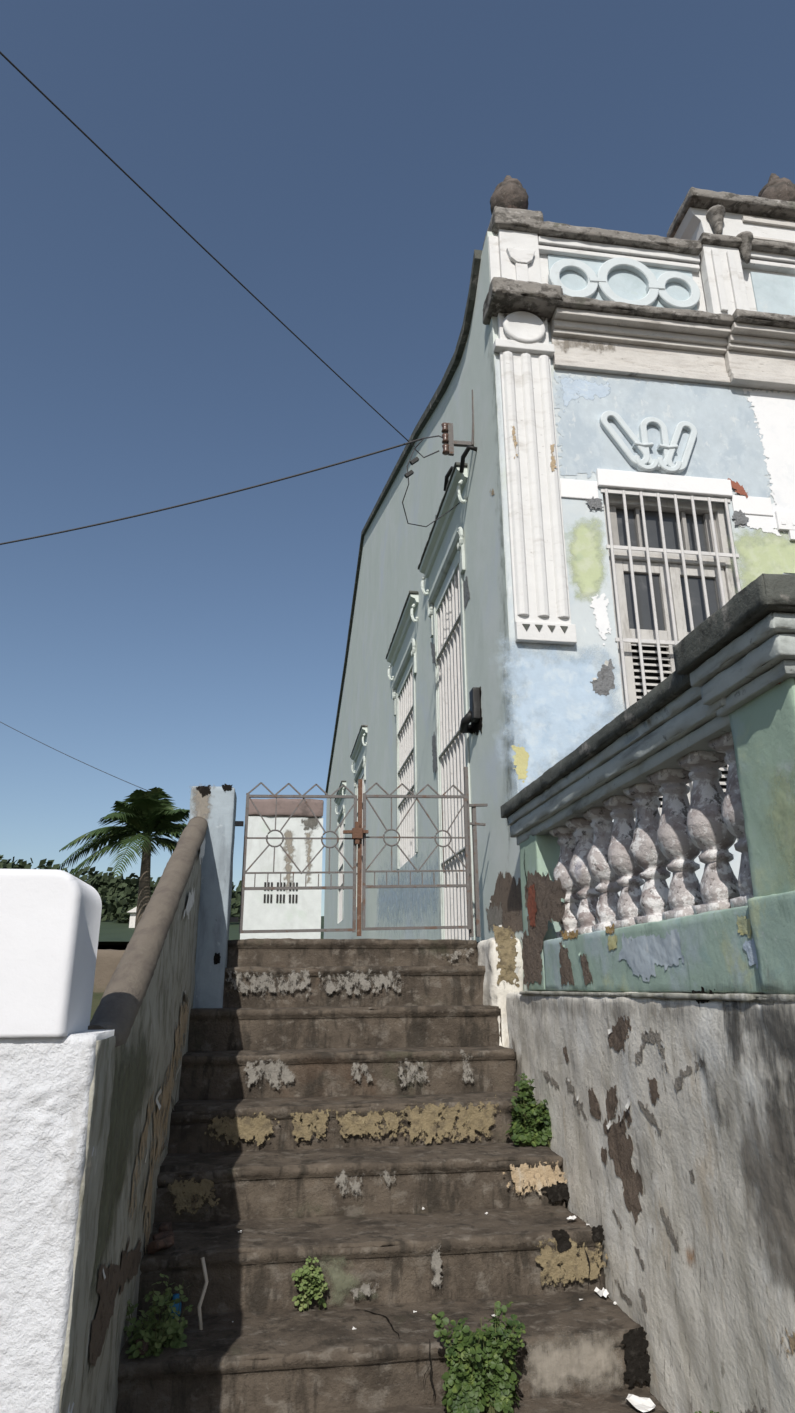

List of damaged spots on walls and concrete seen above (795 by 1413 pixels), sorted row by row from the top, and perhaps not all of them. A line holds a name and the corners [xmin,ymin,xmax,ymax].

peeling [553,371,795,590]
peeling [505,497,617,791]
spalling [486,870,593,989]
peeling [605,924,685,982]
spalling [89,992,220,1372]
peeling [204,1095,501,1147]
spalling [503,1161,570,1202]
spalling [535,1015,703,1387]
water stain [699,1055,722,1121]
water stain [726,998,795,1287]
flaking render [781,1328,795,1358]